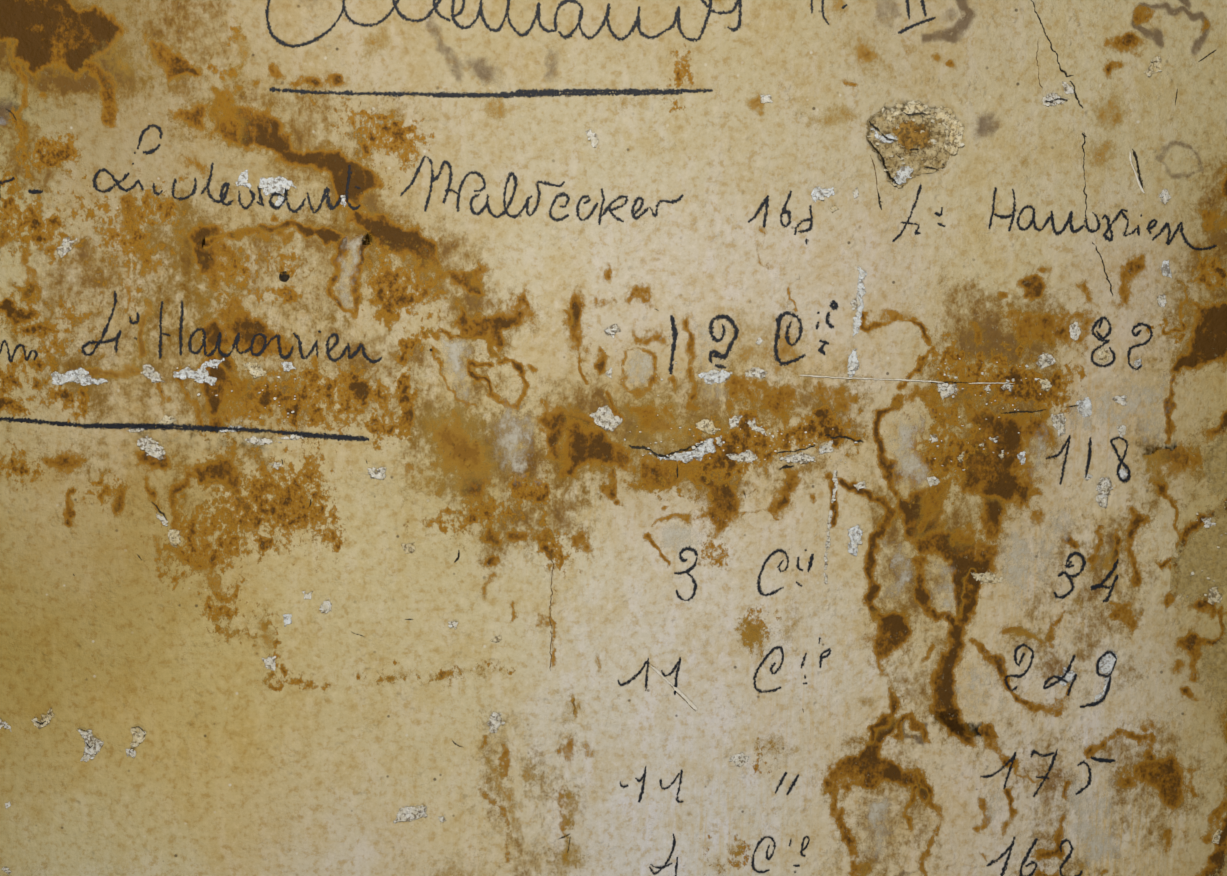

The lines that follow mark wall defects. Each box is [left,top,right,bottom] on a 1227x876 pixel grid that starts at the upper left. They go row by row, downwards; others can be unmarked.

spalling [866,100,965,193]
damp [148,190,380,321]
damp [431,328,538,471]
damp [594,331,666,399]
peeling [847,266,867,378]
damp [860,309,953,497]
peeling [589,405,846,584]
peeling [848,525,863,556]
damp [1173,594,1227,701]
spalling [78,728,104,762]
spalling [126,726,146,758]
damp [823,717,944,876]